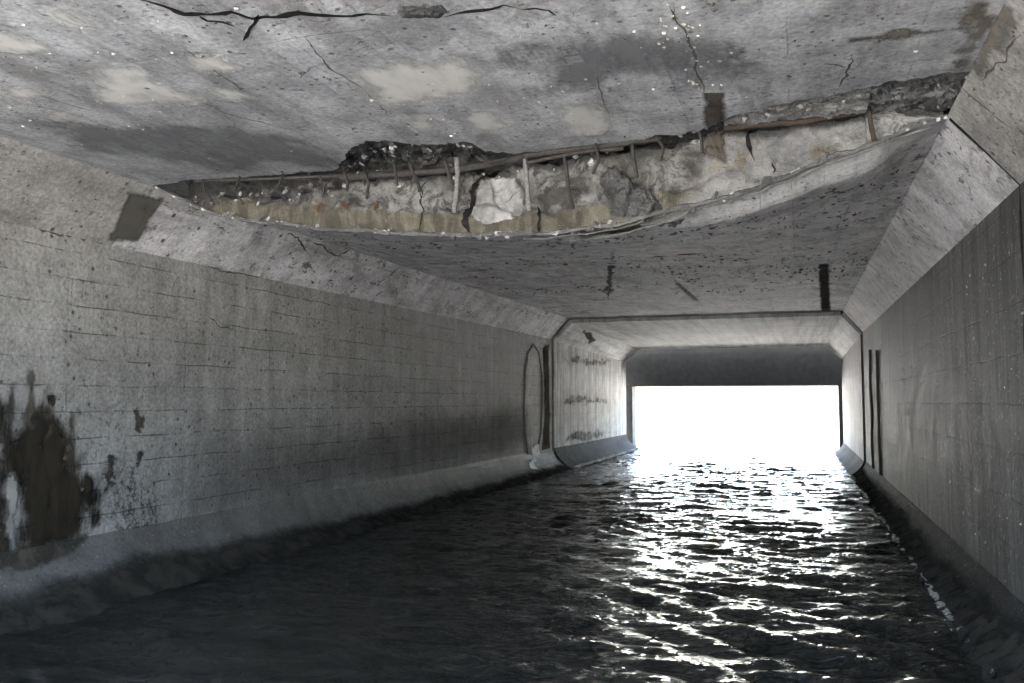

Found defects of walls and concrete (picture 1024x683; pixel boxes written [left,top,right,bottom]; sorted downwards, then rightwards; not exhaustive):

crack [142,0,395,130]
crack [670,4,705,89]
spalling [654,71,970,153]
crack [967,36,1020,128]
spalling [190,140,540,224]
spalling [572,151,620,172]
spalling [523,207,695,242]
leakage [0,345,570,635]